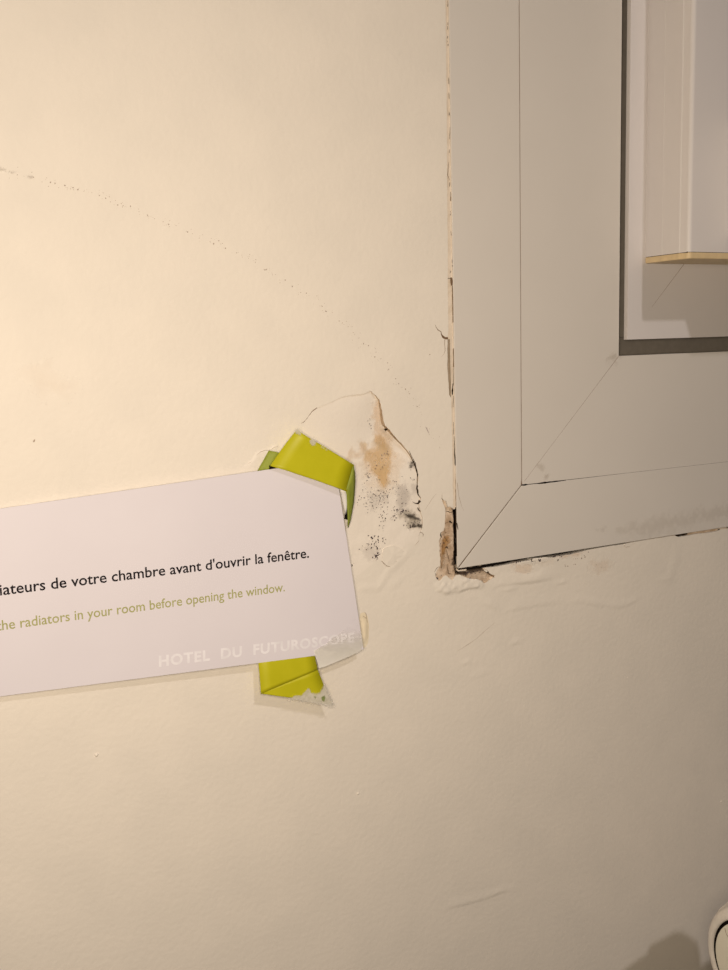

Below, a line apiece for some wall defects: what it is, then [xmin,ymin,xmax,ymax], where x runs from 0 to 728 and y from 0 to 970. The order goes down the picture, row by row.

peeling [302,391,424,577]
damp [357,451,422,558]
flaking render [434,500,494,583]